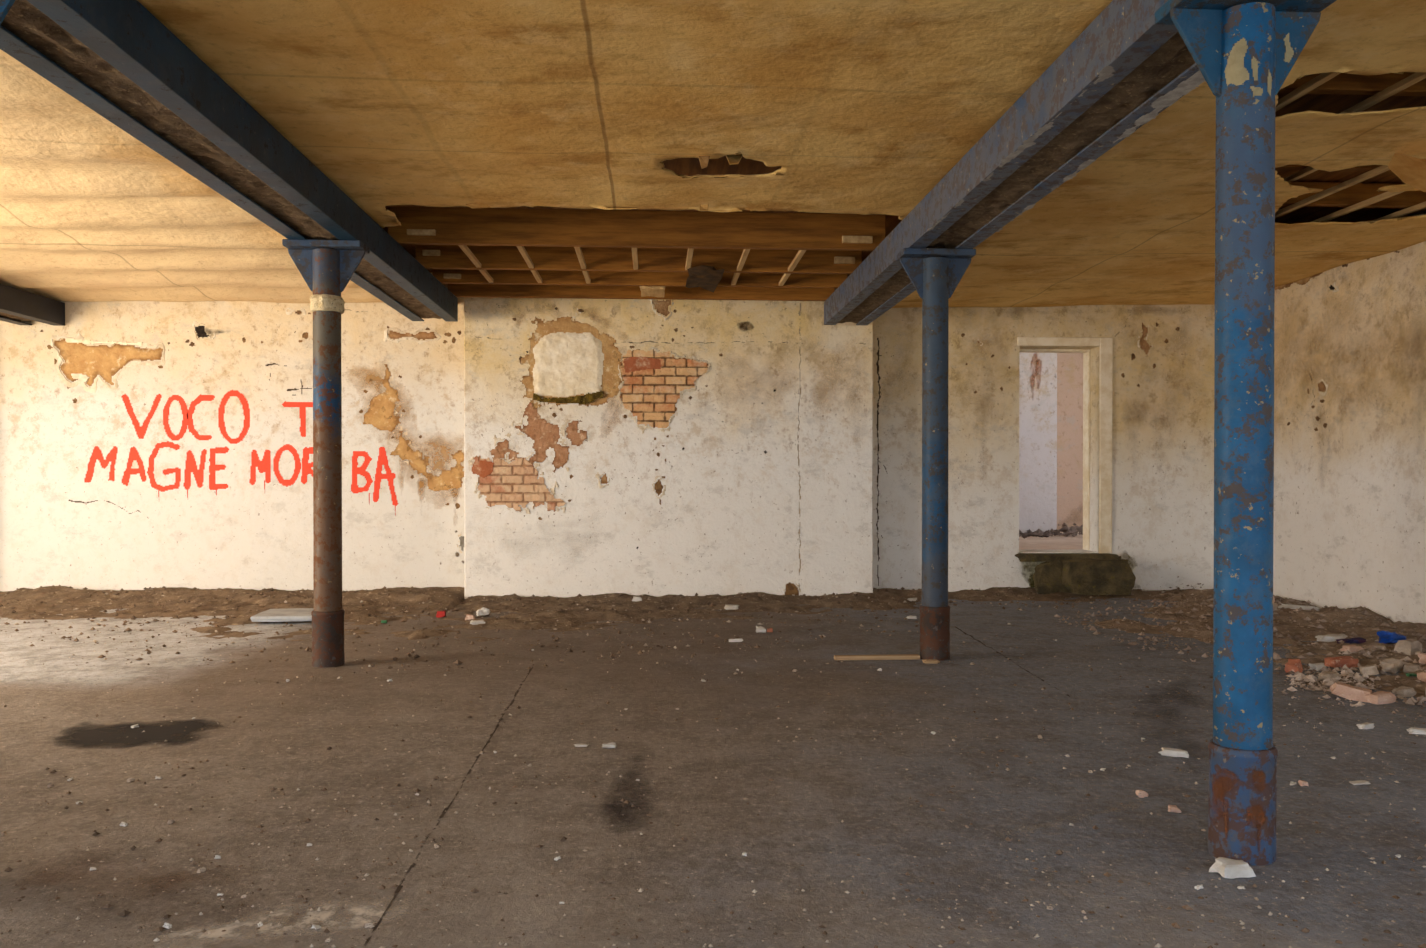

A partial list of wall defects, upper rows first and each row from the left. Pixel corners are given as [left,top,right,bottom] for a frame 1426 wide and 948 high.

peeling [1224,38,1272,97]
peeling [1284,33,1294,63]
peeling [40,321,216,403]
peeling [383,326,461,344]
spalling [648,299,723,387]
peeling [359,362,464,509]
peeling [490,307,636,520]
peeling [638,415,677,512]
crack [365,664,534,945]
corrosion [1246,770,1266,851]